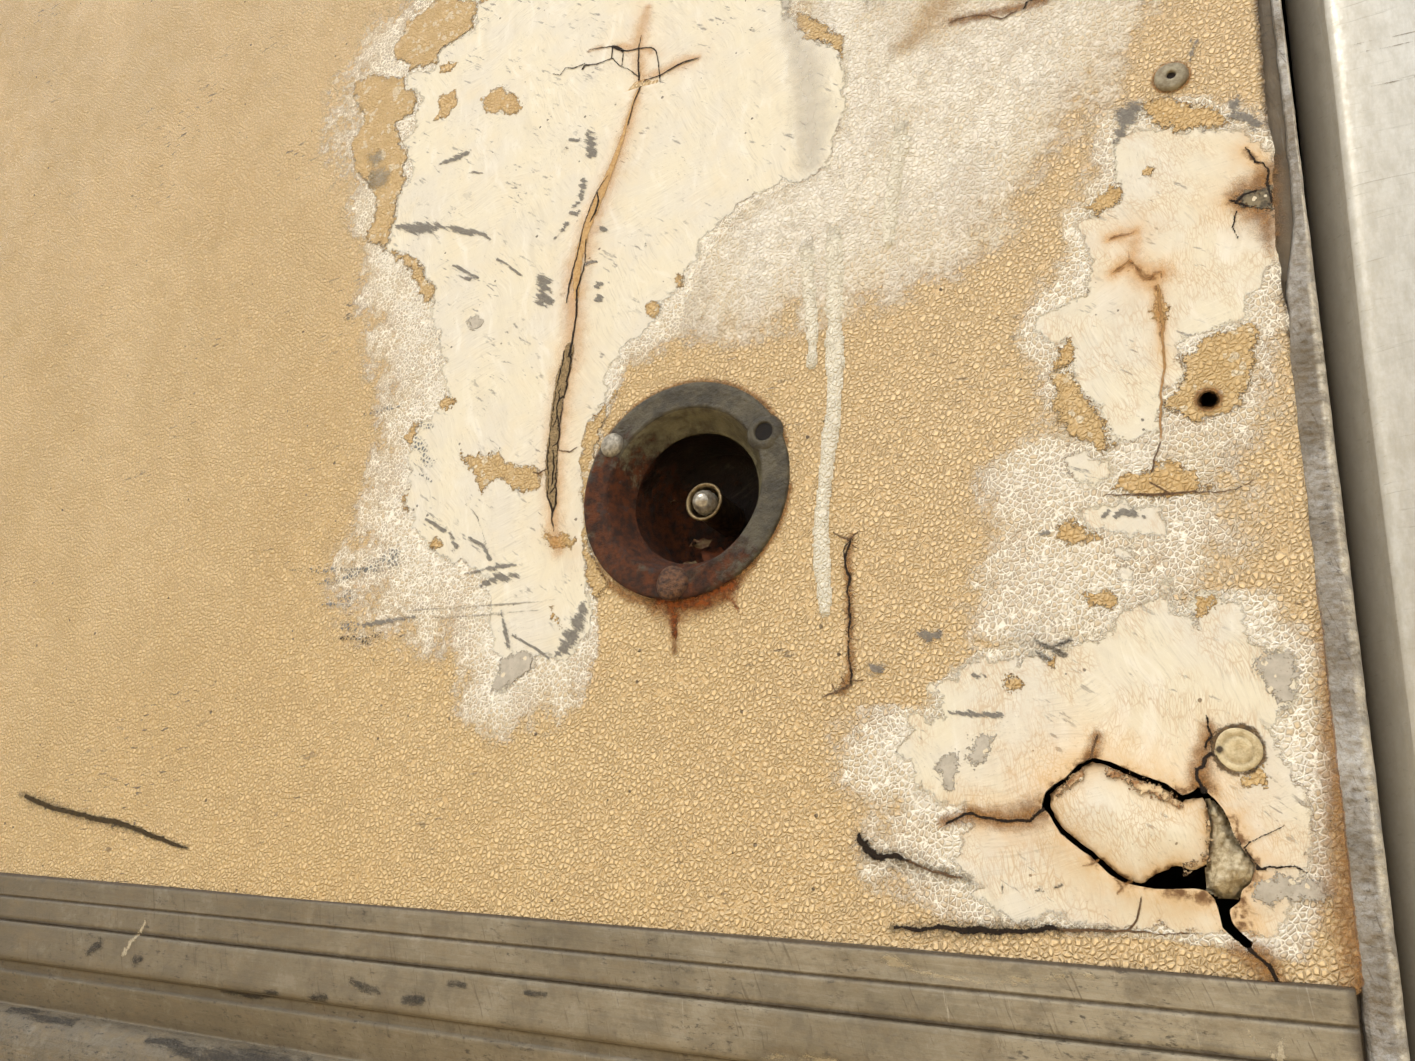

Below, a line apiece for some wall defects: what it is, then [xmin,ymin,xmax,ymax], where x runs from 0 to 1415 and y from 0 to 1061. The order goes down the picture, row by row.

crack [949,0,1046,24]
crack [532,35,699,531]
crack [1106,232,1254,496]
corrosion [609,379,788,443]
peeling [321,0,1337,963]
corrosion [596,483,792,654]
crack [823,532,863,697]
crack [1190,715,1217,794]
crack [857,833,969,882]
crack [938,801,1048,827]
crack [1234,827,1308,874]
crack [891,860,1197,938]